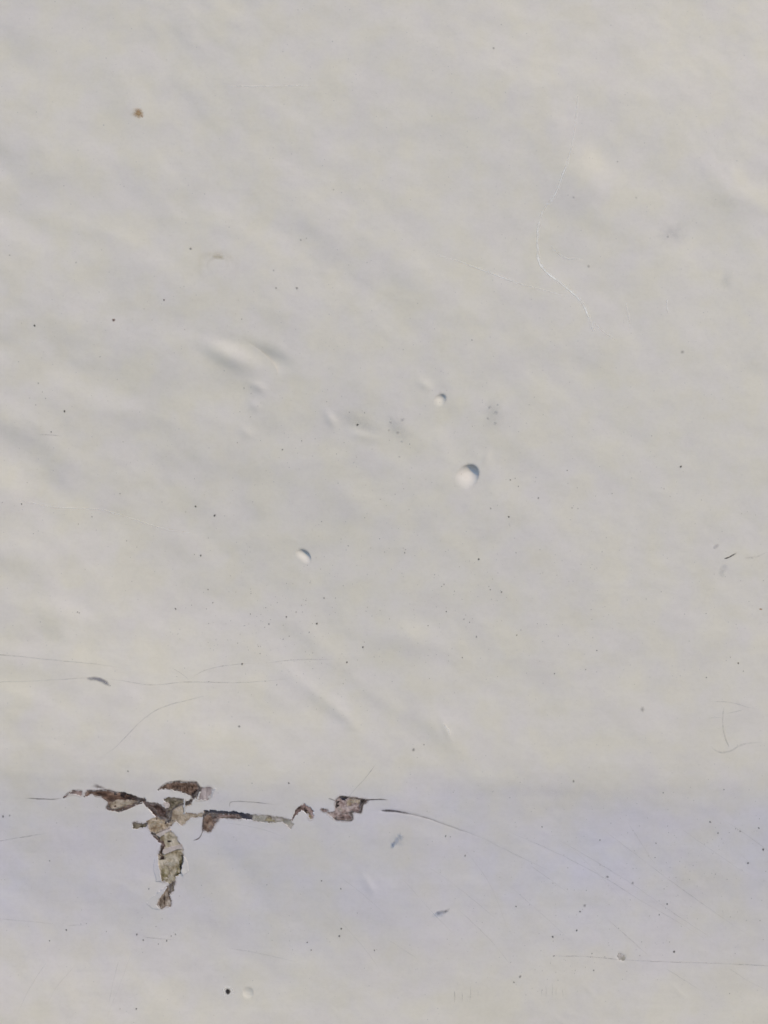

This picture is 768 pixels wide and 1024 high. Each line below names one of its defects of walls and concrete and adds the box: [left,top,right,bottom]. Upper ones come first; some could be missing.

peeling [63,781,367,910]